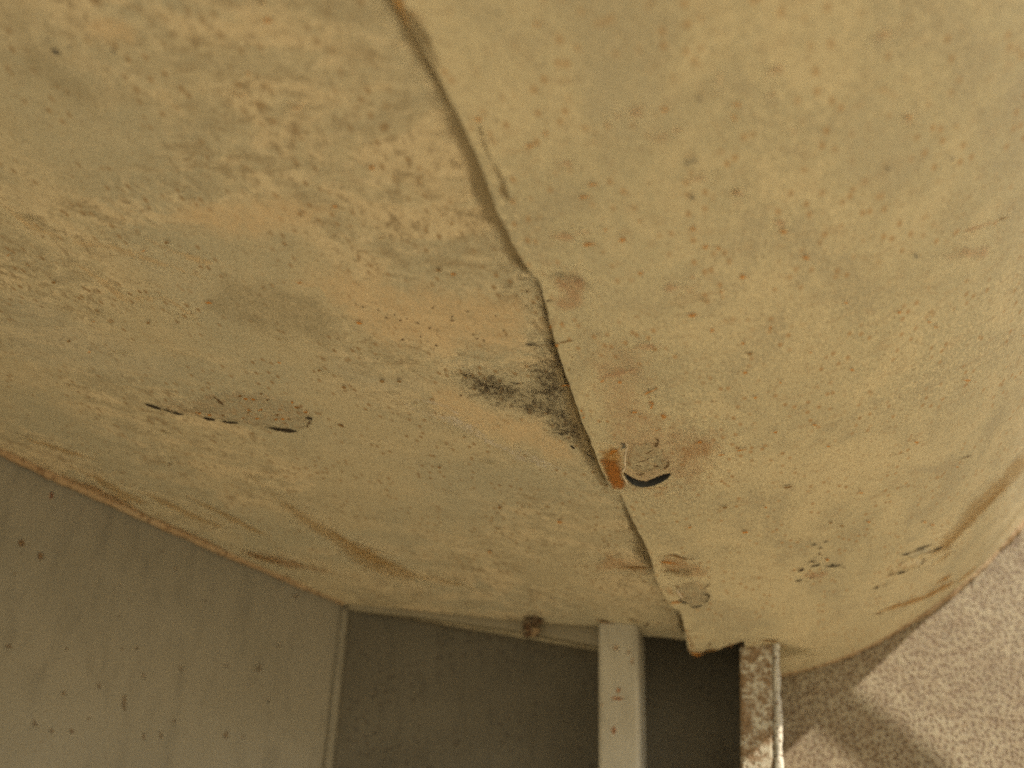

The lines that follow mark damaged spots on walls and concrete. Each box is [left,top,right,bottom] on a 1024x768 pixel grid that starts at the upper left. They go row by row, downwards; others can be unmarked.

water stain [157,182,350,249]
water stain [181,251,594,470]
peeling [145,390,312,433]
rust [601,450,624,489]
peeling [621,439,670,489]
peeling [675,580,711,608]